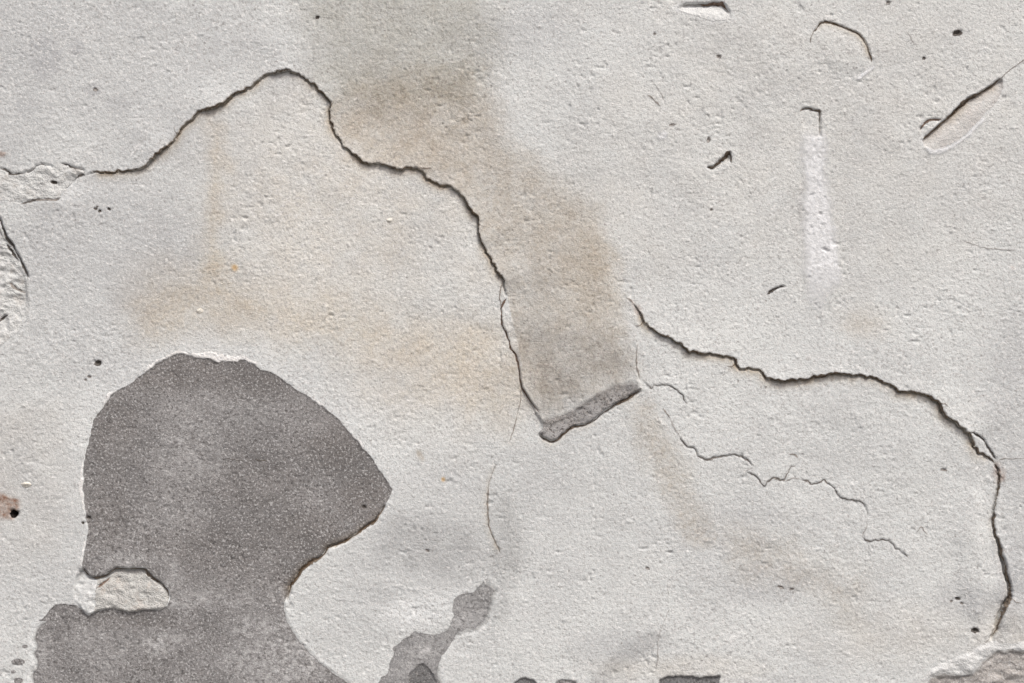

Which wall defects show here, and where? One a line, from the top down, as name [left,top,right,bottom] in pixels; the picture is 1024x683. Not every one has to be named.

spalling [676,1,732,21]
crack [810,21,872,61]
spalling [920,60,1024,150]
spalling [0,220,30,346]
crack [0,69,539,442]
peeling [539,384,641,442]
peeling [11,348,392,683]
crack [486,467,500,552]
crack [627,298,1024,644]
peeling [379,582,493,683]
peeling [921,641,1024,683]